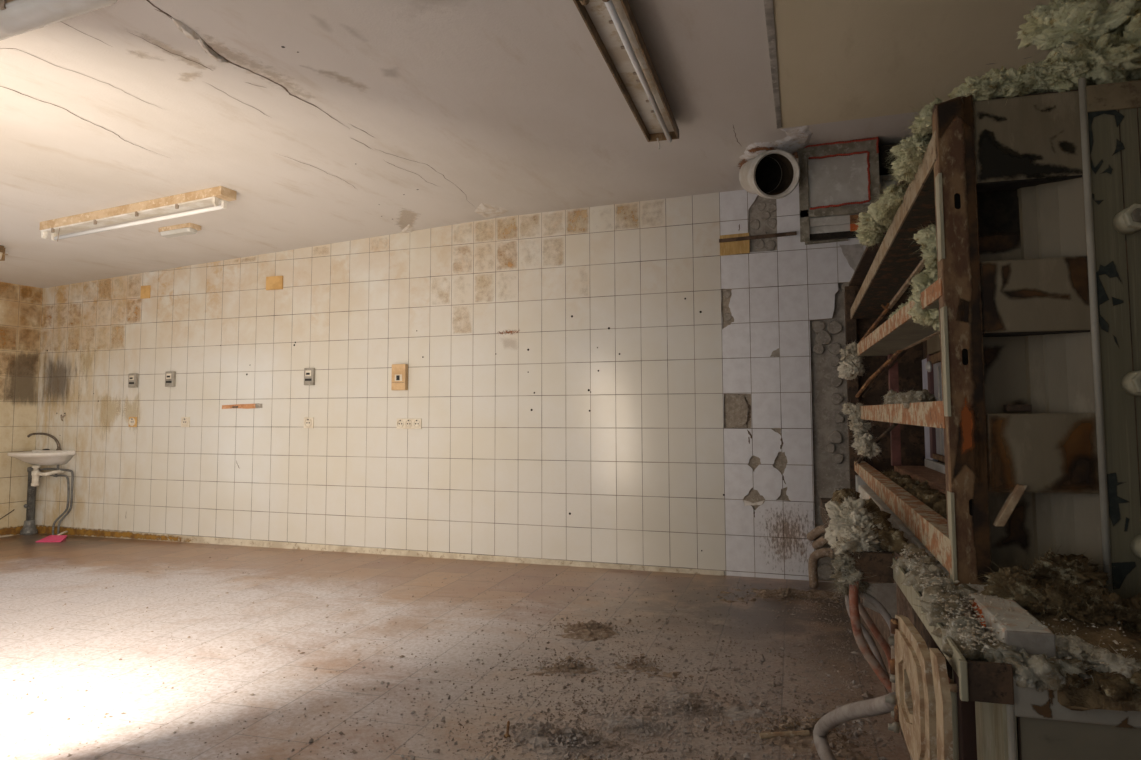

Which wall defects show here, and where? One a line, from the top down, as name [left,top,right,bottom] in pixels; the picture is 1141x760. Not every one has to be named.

crack [60,0,470,203]
spalling [721,289,734,329]
spalling [724,394,751,428]
spalling [743,452,790,510]
rust [762,513,807,560]